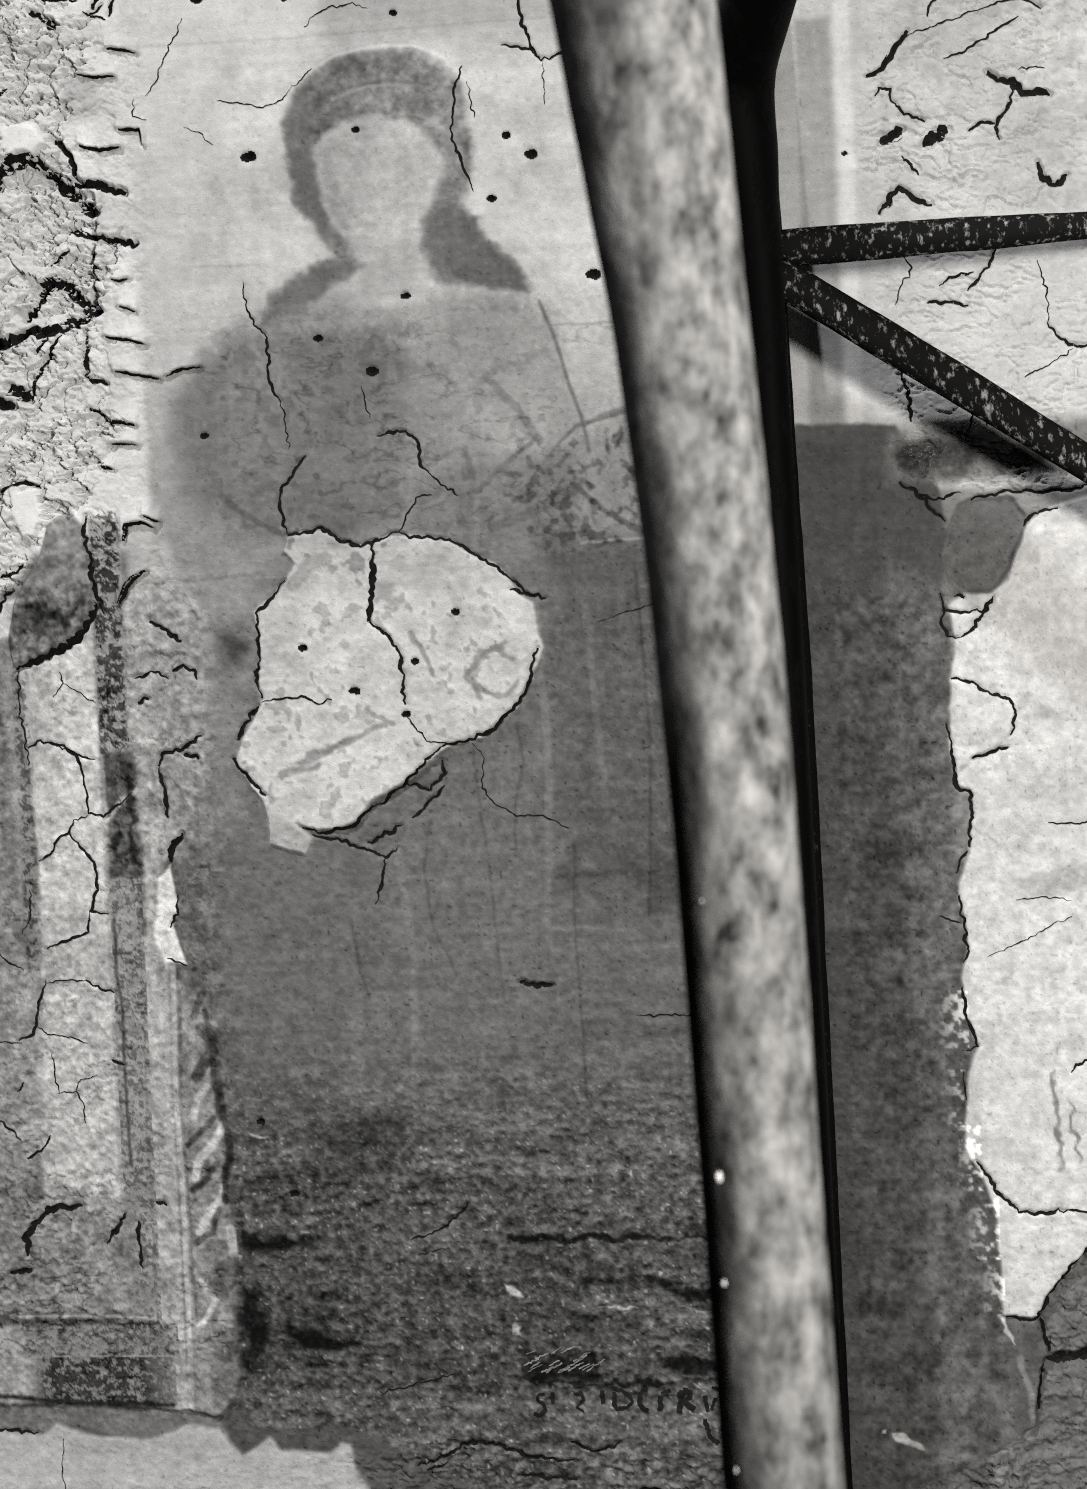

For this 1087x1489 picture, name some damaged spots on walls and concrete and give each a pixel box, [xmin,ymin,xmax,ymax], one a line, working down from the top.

crack [0,140,138,410]
crack [28,0,114,30]
crack [502,0,559,104]
crack [895,249,996,307]
crack [866,0,1050,215]
crack [1037,162,1067,187]
peeling [236,530,546,855]
crack [242,283,569,905]
crack [0,516,332,1159]
peeling [918,497,1087,1489]
crack [10,1203,83,1274]
crack [976,1161,1087,1409]